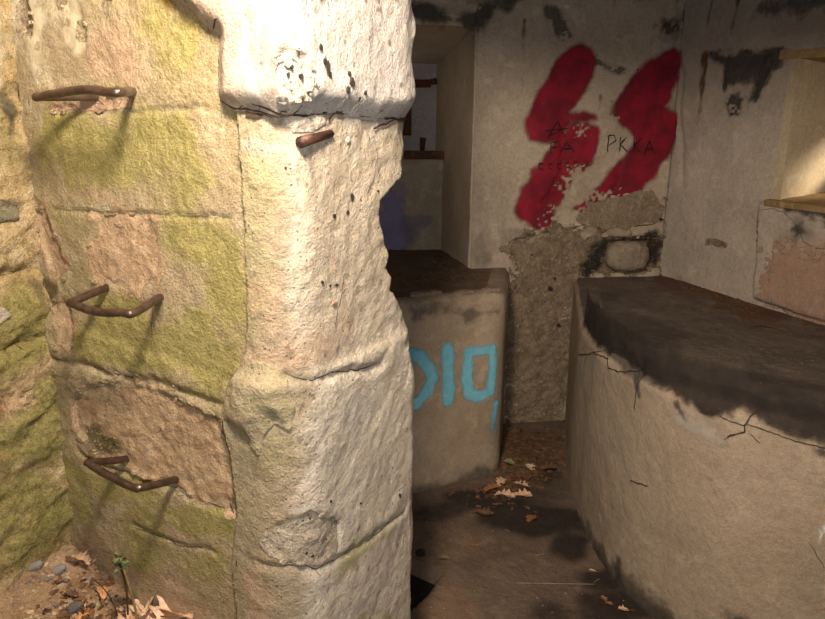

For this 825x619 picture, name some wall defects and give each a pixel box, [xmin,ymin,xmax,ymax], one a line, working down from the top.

leakage [241,26,264,104]
leakage [709,47,783,116]
spalling [499,190,666,424]
peeling [757,239,825,325]
crack [720,412,823,448]